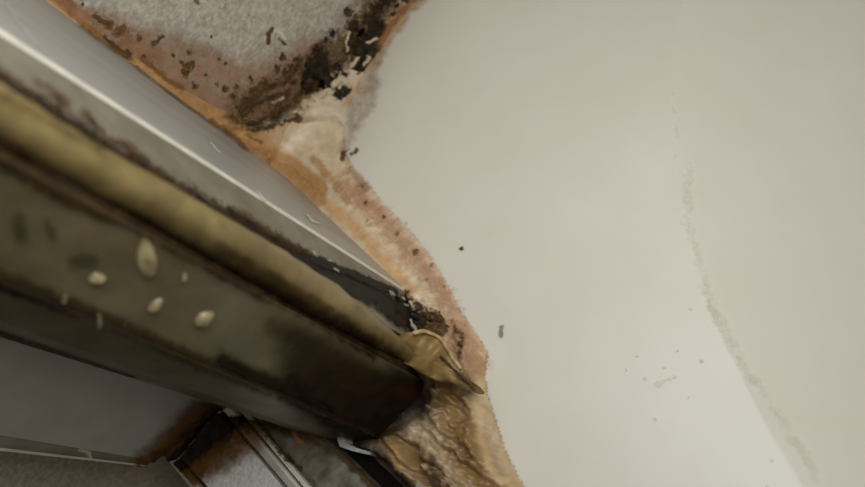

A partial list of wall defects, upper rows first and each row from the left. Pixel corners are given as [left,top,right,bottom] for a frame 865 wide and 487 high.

corrosion [55,0,165,65]
leakage [78,0,416,239]
leakage [0,69,478,441]